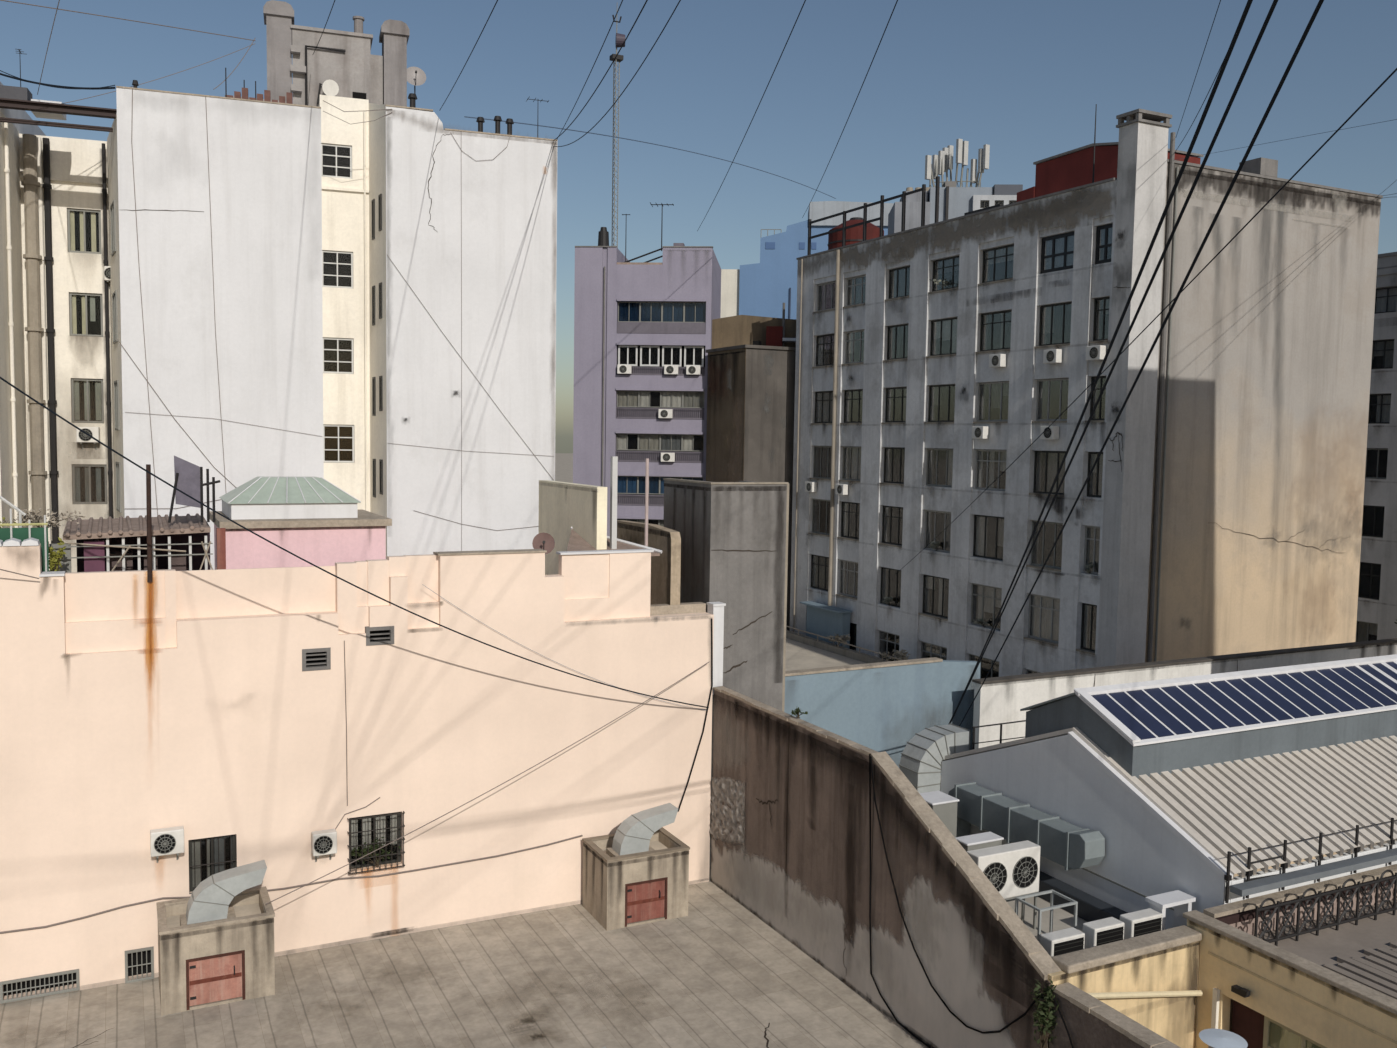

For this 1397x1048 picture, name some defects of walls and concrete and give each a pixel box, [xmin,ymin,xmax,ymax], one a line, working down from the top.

crack [428,134,450,230]
leakage [1173,166,1380,247]
rust [146,571,155,678]
leakage [735,702,1046,1002]
peeling [710,778,1013,1048]